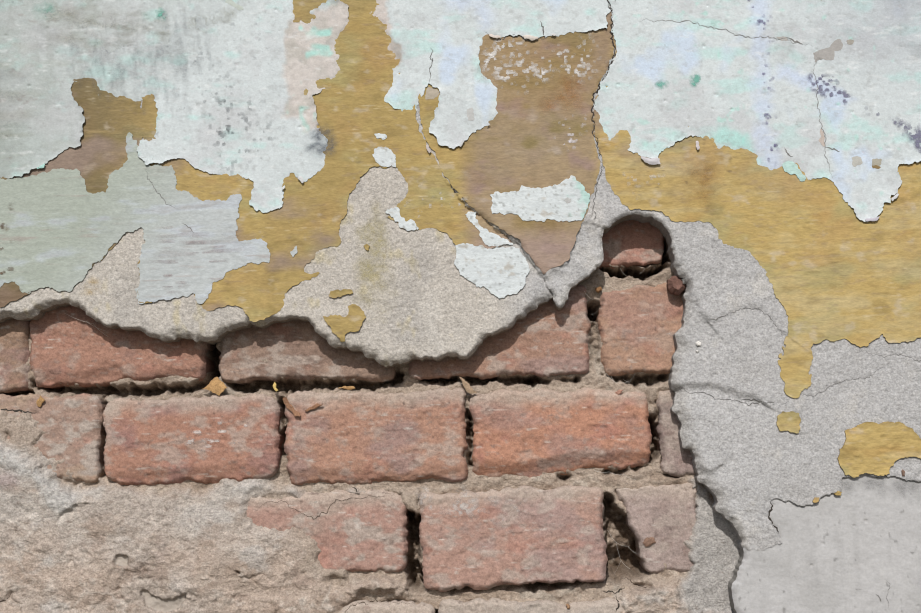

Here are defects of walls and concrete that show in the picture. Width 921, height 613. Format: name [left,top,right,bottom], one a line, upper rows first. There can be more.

peeling [1,78,158,194]
peeling [149,0,496,322]
flaking render [0,146,788,368]
crack [591,0,616,219]
peeling [418,11,921,551]
crack [643,19,840,178]
crack [603,577,646,611]